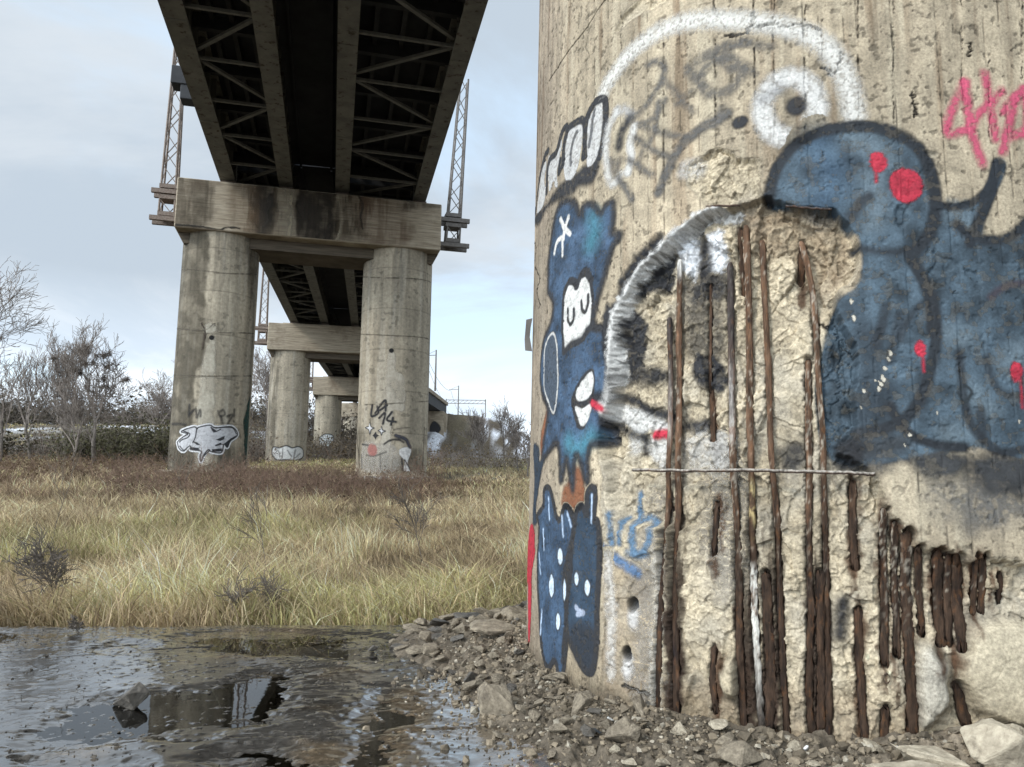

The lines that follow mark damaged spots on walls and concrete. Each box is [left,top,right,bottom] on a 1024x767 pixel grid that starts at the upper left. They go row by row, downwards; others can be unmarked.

leakage [251,186,367,240]
spalling [597,147,1024,744]